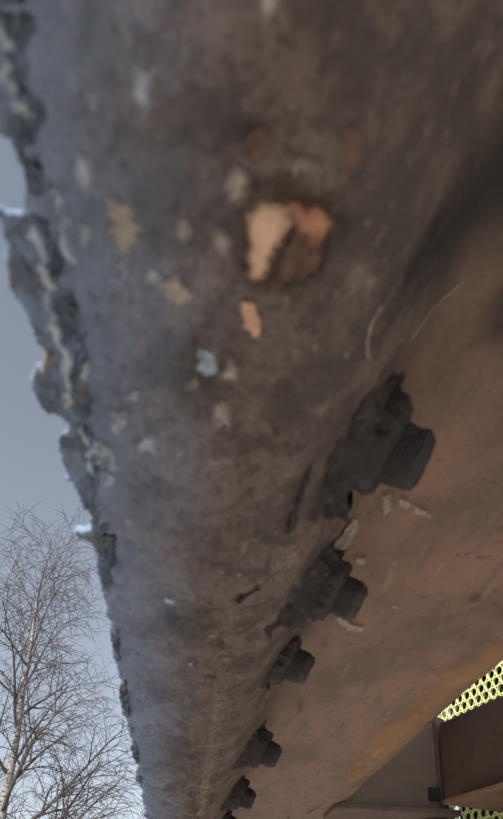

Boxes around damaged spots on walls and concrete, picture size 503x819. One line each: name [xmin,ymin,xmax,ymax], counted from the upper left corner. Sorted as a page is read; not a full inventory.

peeling [242,186,331,288]
peeling [241,302,261,338]